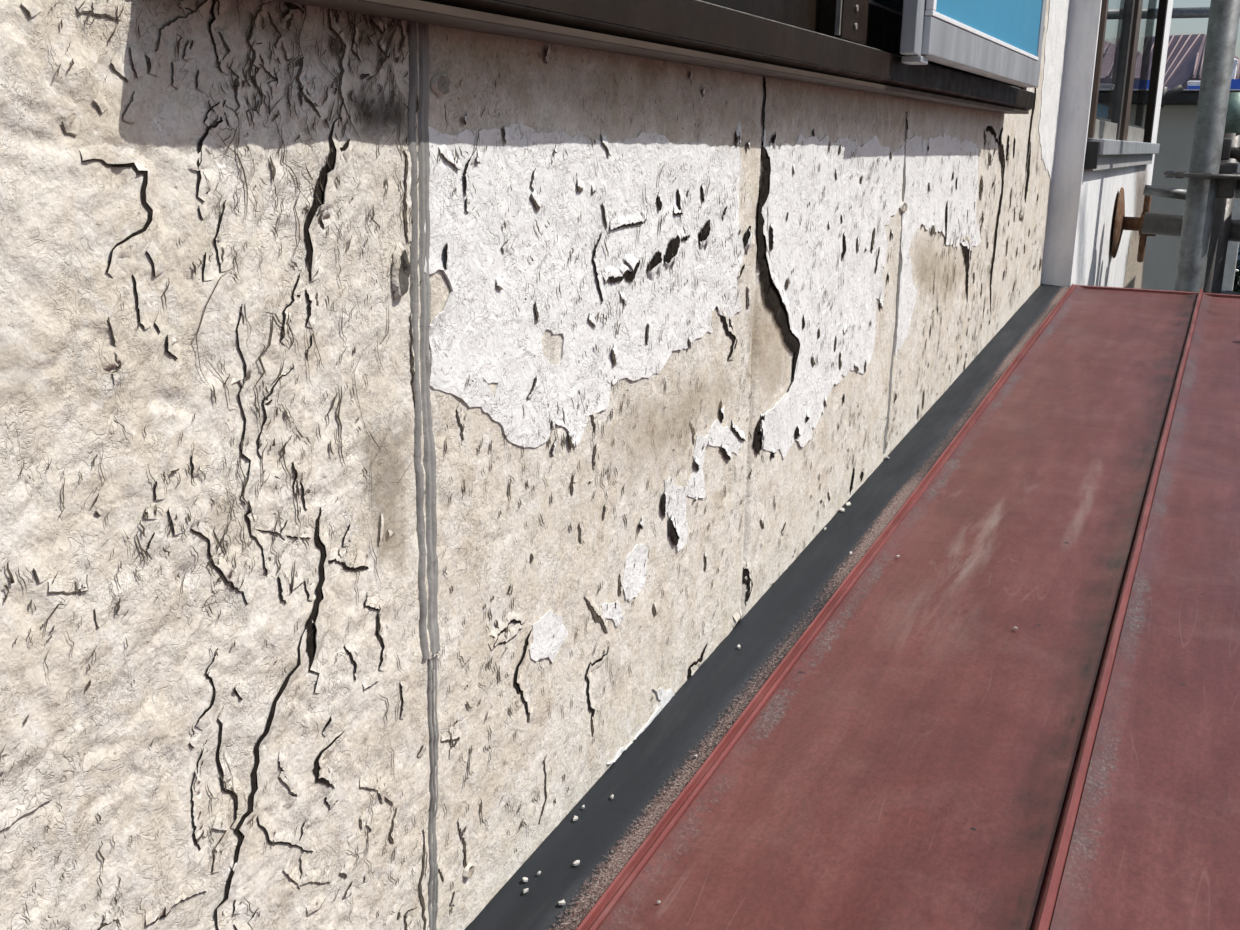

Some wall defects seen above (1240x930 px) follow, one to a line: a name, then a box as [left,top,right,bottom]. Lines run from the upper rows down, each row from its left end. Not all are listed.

peeling [391,124,744,448]
peeling [763,131,981,459]
crack [913,74,1043,421]
crack [0,0,909,930]
peeling [664,418,744,552]